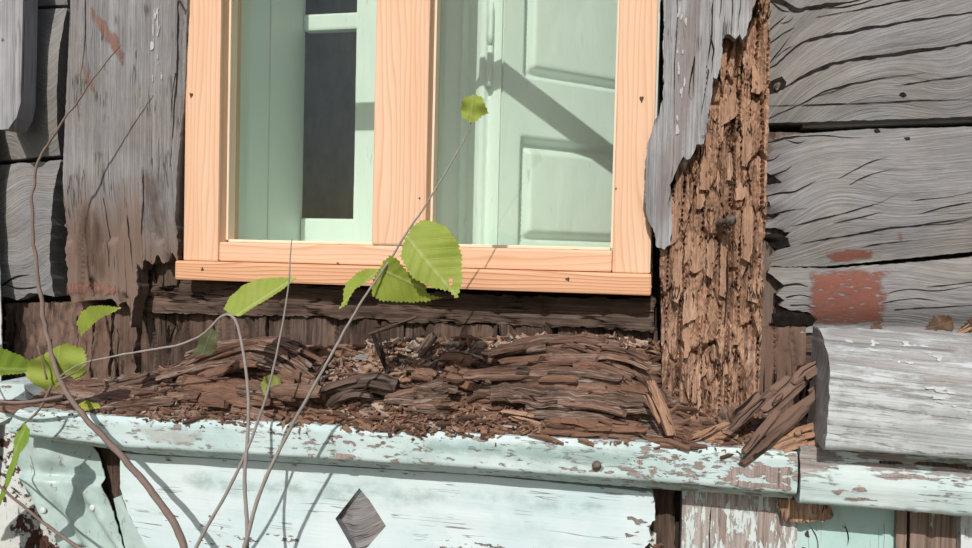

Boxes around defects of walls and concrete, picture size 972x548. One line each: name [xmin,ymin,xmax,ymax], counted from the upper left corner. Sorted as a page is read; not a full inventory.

crack [766,0,972,248]
spalling [659,0,771,420]
crack [781,283,816,309]
crack [882,282,971,310]
peeling [889,341,943,364]
peeling [926,386,972,411]
peeling [328,435,364,461]
peeling [626,457,705,481]
peeling [717,462,793,491]
peeling [16,515,46,548]
peeling [718,505,727,545]
peeling [745,510,788,548]